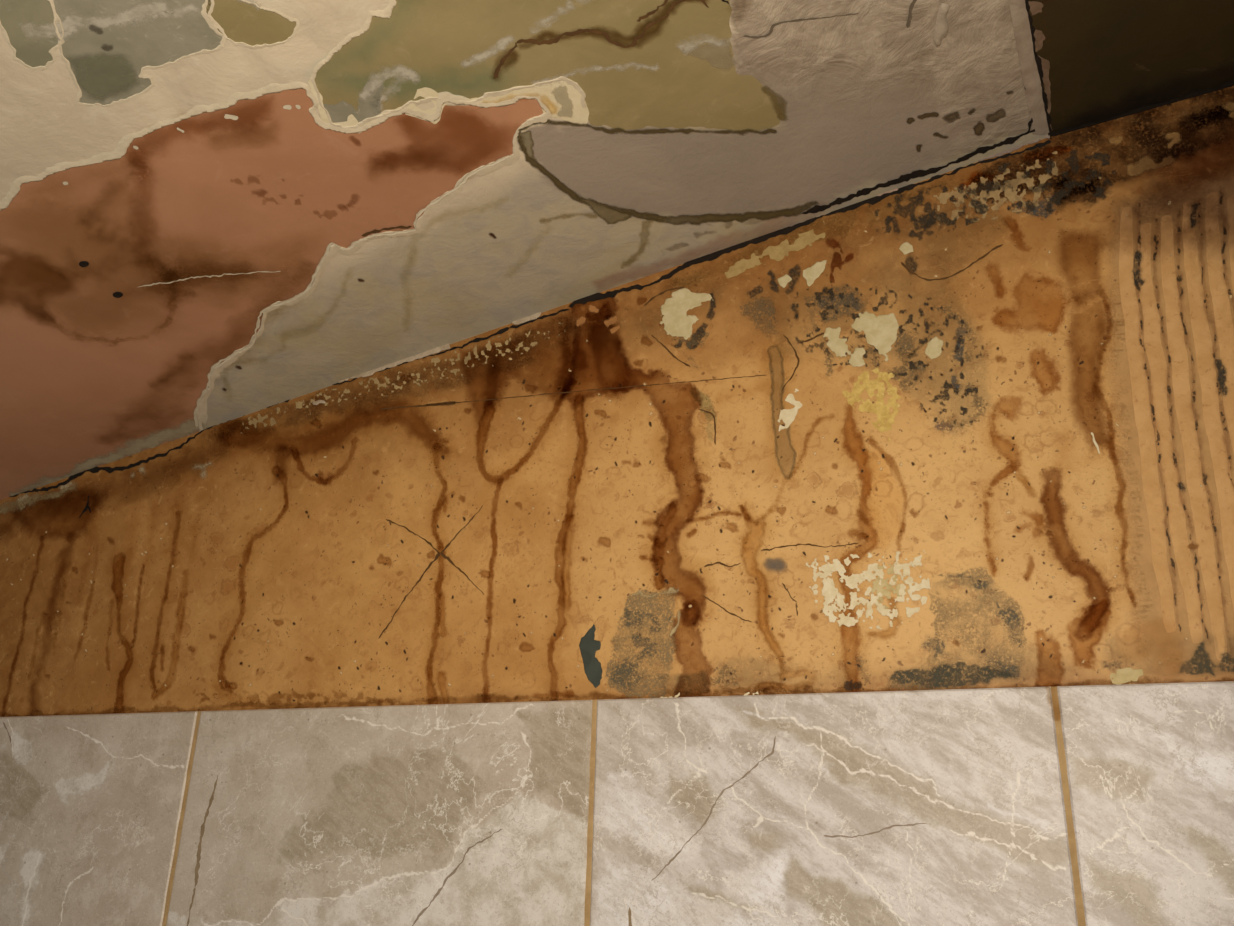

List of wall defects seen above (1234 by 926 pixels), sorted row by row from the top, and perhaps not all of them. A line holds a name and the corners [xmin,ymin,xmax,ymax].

leakage [907,109,1005,139]
peeling [1028,1,1052,129]
peeling [0,0,817,500]
crack [333,0,1234,385]
leakage [875,151,1116,240]
crack [380,332,825,444]
leakage [674,293,716,349]
leakage [742,266,983,430]
leakage [1215,359,1228,395]
crack [10,399,290,518]
crack [379,507,484,638]
peeling [579,588,680,698]